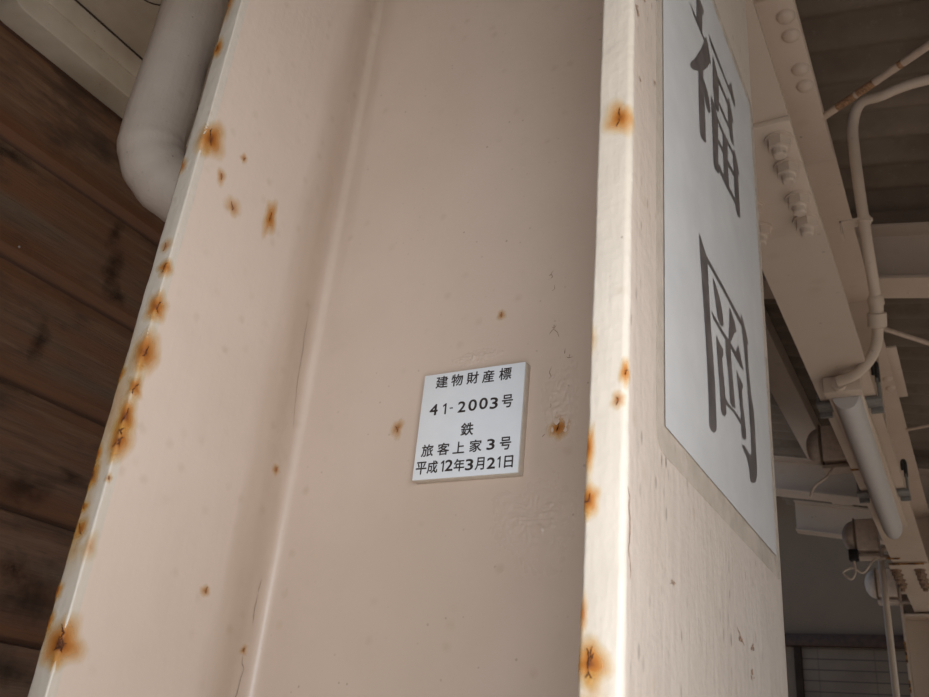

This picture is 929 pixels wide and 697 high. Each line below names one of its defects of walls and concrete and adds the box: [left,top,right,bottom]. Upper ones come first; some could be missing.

rust [609,106,632,128]
rust [199,128,221,152]
rust [266,207,275,228]
rust [147,295,165,317]
rust [135,335,155,368]
rust [621,363,629,381]
rust [88,368,140,487]
rust [552,421,565,435]
rust [584,487,597,513]
rust [45,614,79,663]
rust [578,645,604,681]